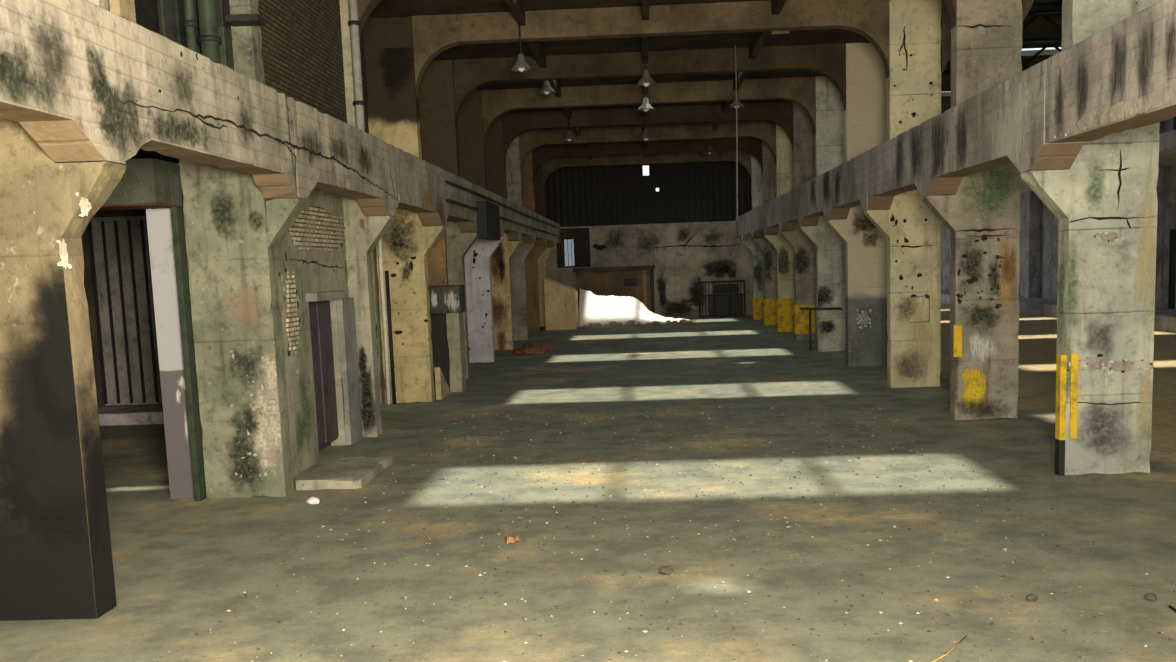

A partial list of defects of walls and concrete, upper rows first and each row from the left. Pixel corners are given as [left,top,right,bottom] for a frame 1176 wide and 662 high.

water stain [87,50,207,149]
water stain [241,112,251,140]
crack [119,98,400,201]
crack [1070,149,1158,230]
mould [231,355,256,381]
mould [230,404,276,486]